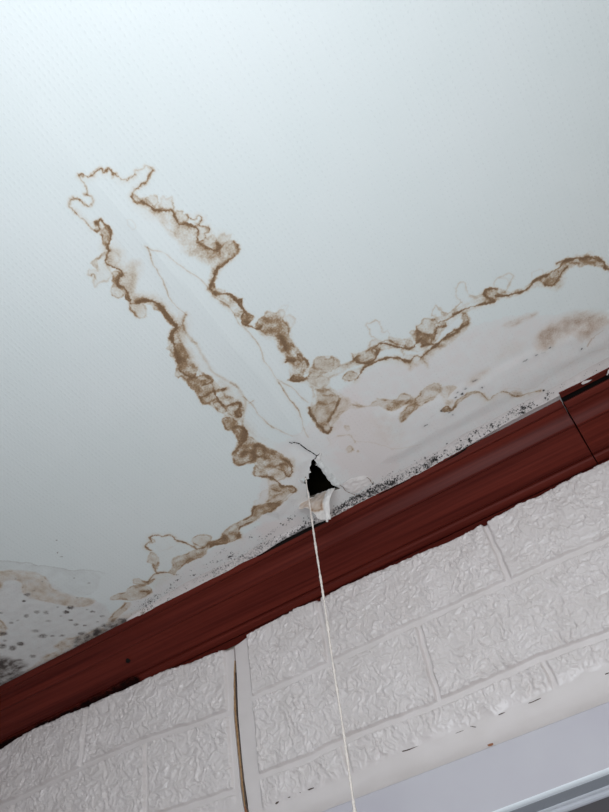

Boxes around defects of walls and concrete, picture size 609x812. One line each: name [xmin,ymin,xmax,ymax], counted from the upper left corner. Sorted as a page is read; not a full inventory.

leakage [0,162,609,686]